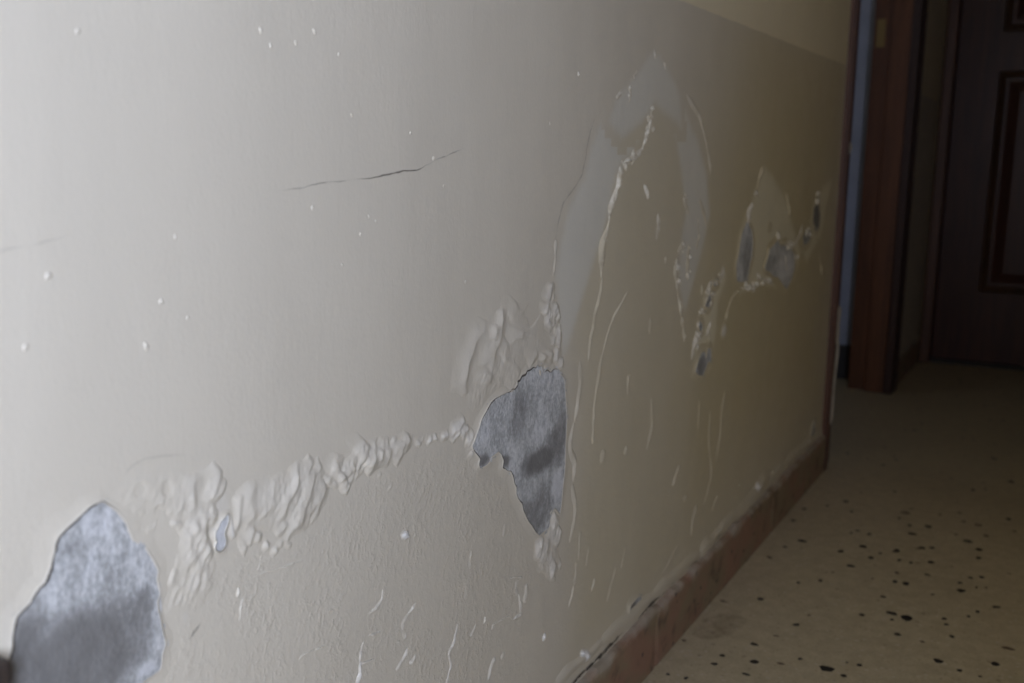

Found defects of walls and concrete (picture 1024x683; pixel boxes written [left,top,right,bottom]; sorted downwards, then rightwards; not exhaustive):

leakage [546,33,837,394]
spalling [664,165,773,383]
spalling [465,360,571,540]
spalling [0,489,174,683]